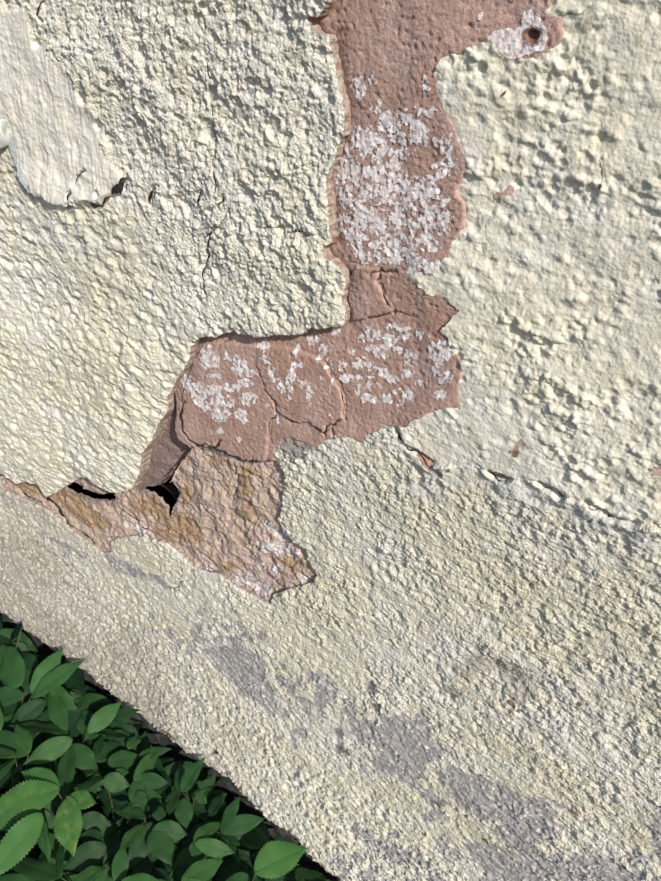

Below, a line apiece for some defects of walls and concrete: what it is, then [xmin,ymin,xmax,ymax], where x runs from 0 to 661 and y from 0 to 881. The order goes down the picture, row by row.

crack [67,170,127,210]
crack [197,58,227,301]
spalling [1,0,564,601]
crack [256,366,345,441]
crack [397,430,430,467]